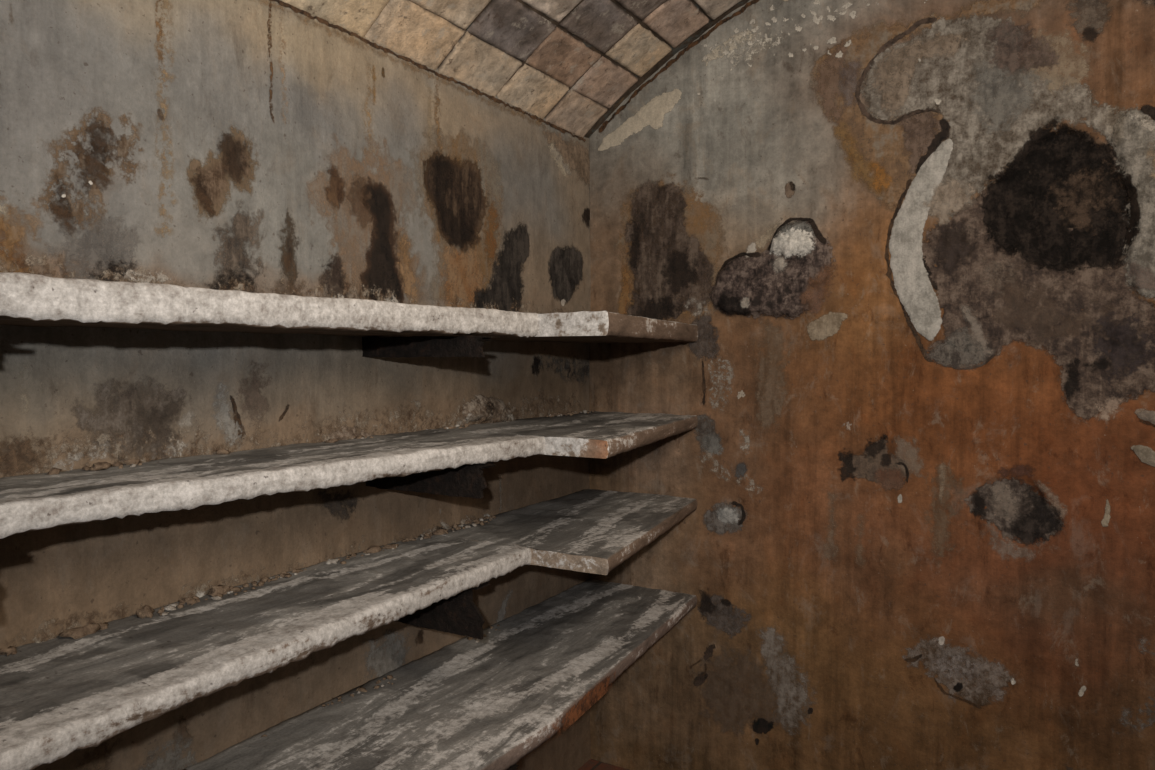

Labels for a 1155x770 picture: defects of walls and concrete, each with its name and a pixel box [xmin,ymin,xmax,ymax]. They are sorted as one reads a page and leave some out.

peeling [699,0,879,71]
peeling [543,89,682,184]
damp [38,108,142,282]
damp [187,126,264,293]
damp [320,166,404,303]
damp [423,150,489,251]
damp [473,224,530,312]
damp [616,174,726,360]
flaking render [860,14,1155,427]
flaking render [838,435,924,503]
flaking render [964,465,1067,558]
flaking render [902,636,1014,708]